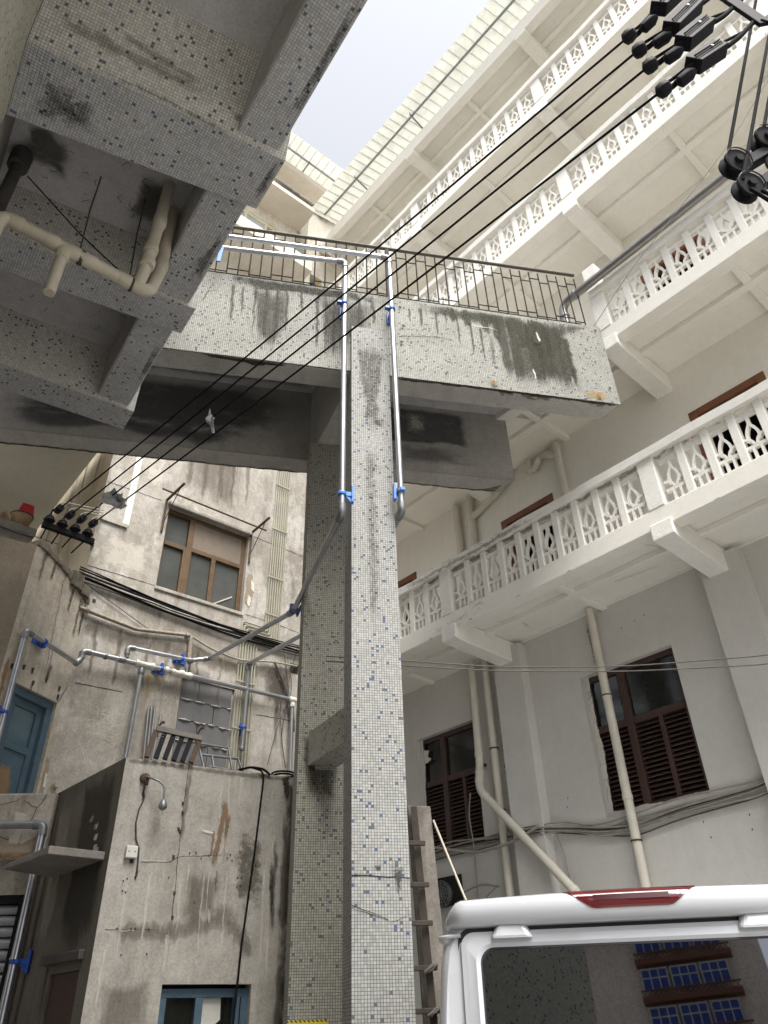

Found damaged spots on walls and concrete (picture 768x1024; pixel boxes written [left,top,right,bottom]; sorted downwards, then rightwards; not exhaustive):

water stain [28,128,74,178]
water stain [117,162,163,232]
water stain [230,277,376,350]
water stain [409,306,580,383]
water stain [359,350,382,425]
crack [105,769,228,953]
corrosion [210,802,231,864]
water stain [237,778,293,1024]
crack [351,872,410,880]